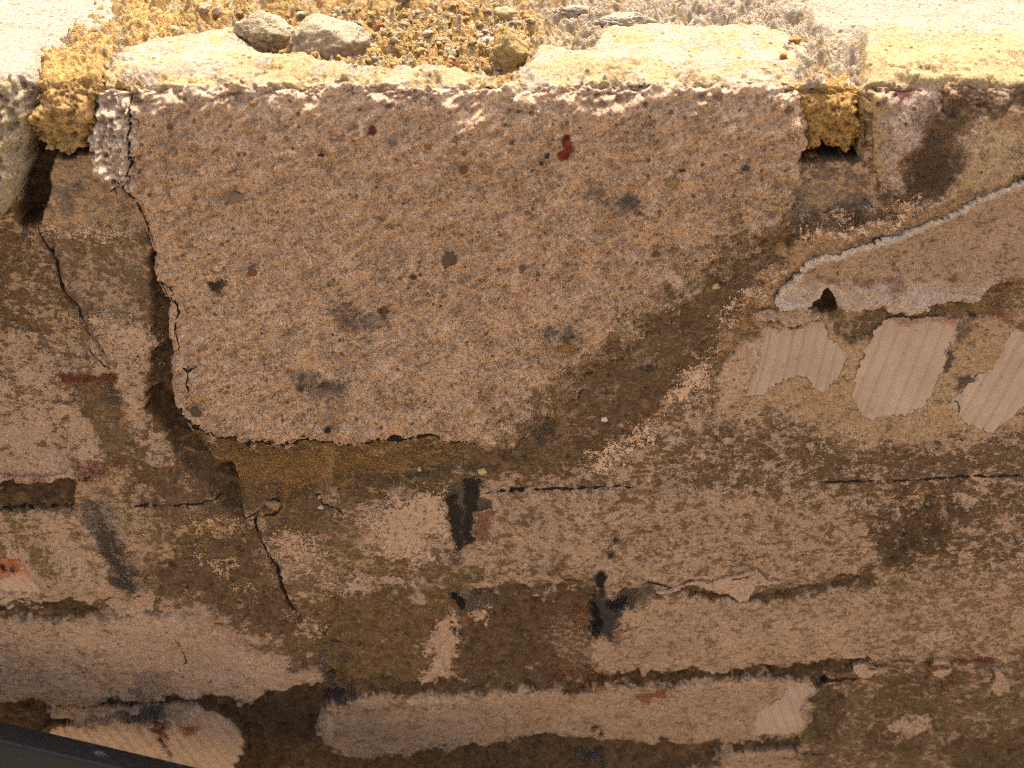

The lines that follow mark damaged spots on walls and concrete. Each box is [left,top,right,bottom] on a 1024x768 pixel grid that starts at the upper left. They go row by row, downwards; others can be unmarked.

damp [904,88,1024,202]
crack [38,227,84,320]
flaking render [745,178,1024,433]
crack [244,498,301,616]
damp [445,478,481,569]
crack [486,485,634,494]
crack [823,474,1022,483]
flaking render [405,690,472,706]
flaking render [683,673,768,689]
spalling [719,682,817,761]